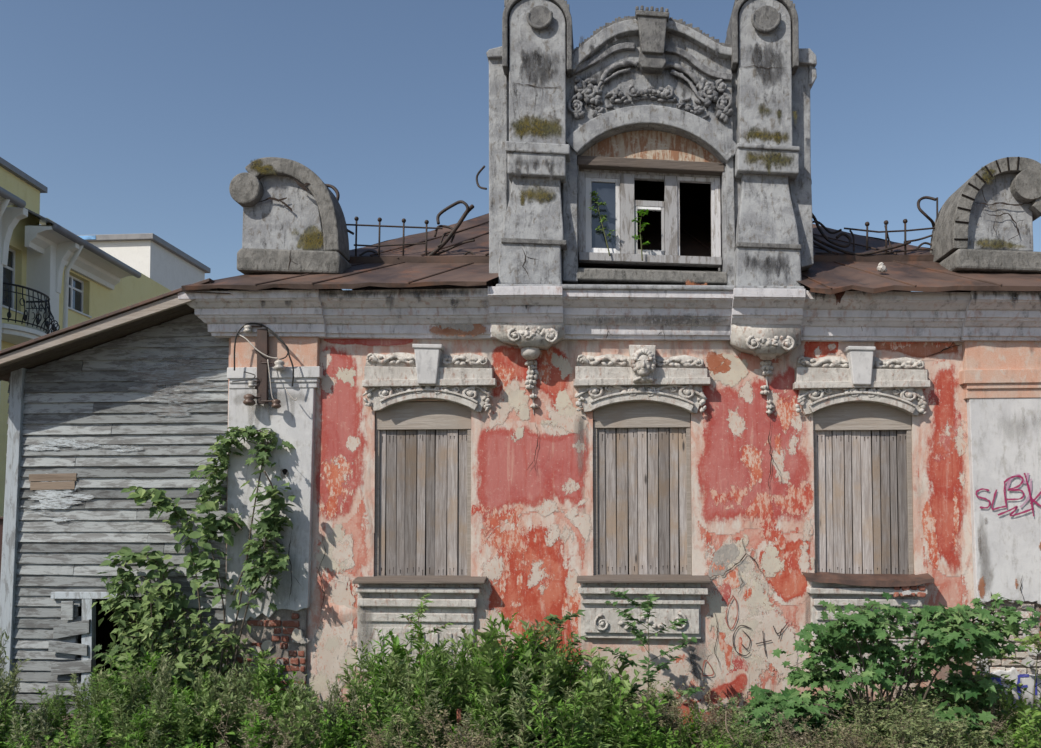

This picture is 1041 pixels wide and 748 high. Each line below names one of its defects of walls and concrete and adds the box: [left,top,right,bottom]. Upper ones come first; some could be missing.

water stain [522,51,556,85]
water stain [753,44,782,82]
water stain [748,109,797,173]
crack [975,188,1032,240]
spalling [429,324,486,337]
peeling [871,342,972,577]
peeling [235,339,416,716]
peeling [471,341,842,725]
crack [712,540,764,594]
spalling [988,603,1041,674]